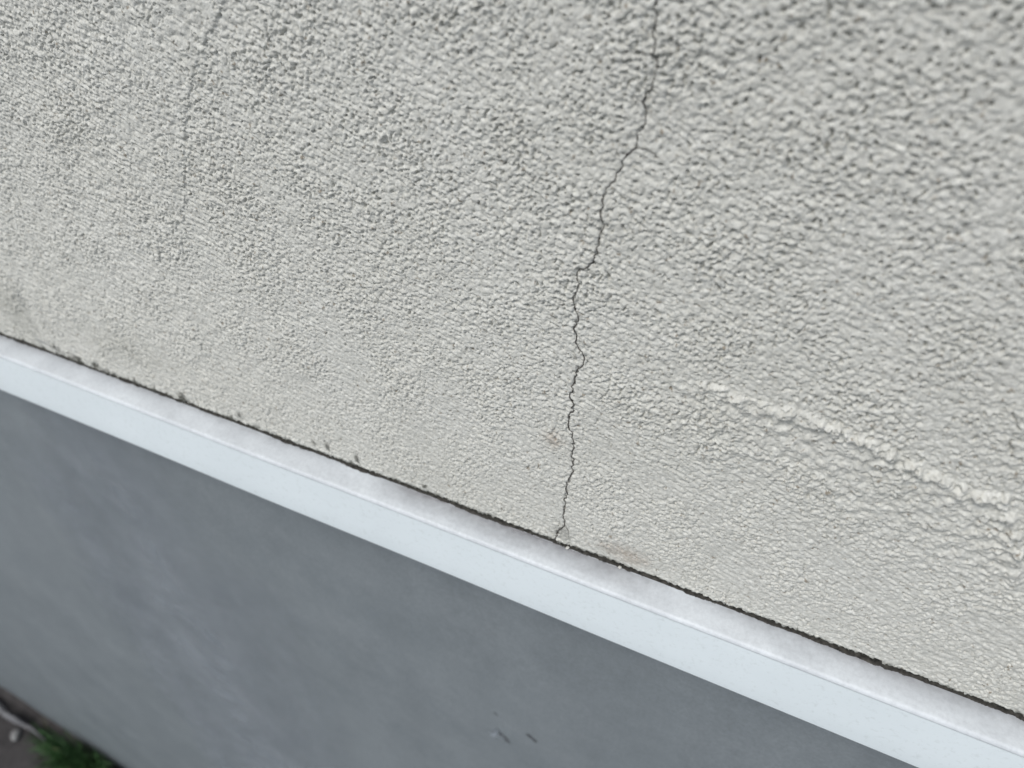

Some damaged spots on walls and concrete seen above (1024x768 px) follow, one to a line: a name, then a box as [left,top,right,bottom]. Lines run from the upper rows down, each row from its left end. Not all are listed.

crack [554,0,659,540]